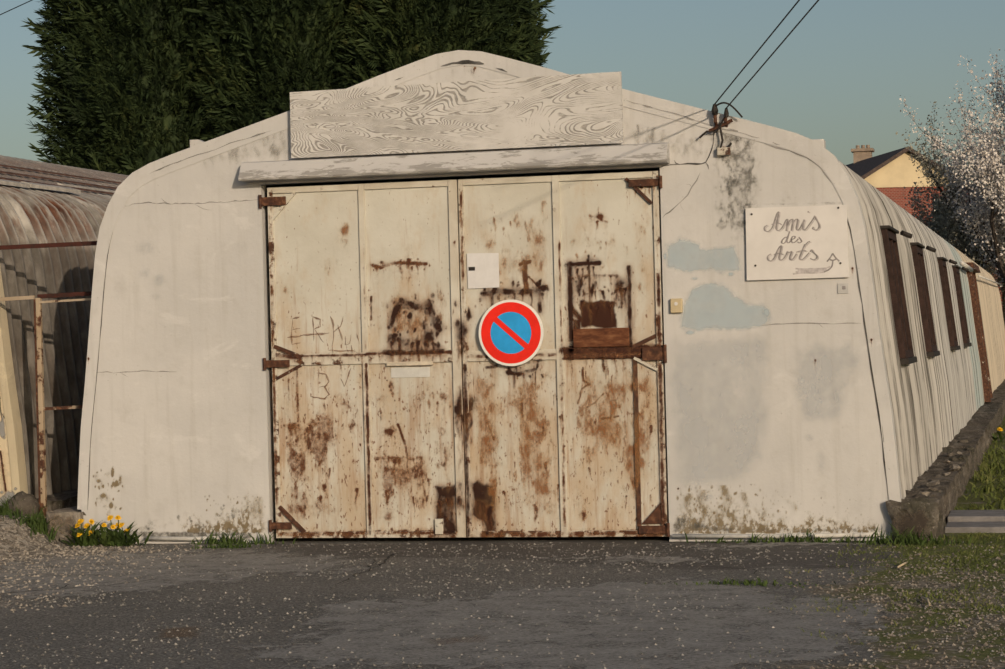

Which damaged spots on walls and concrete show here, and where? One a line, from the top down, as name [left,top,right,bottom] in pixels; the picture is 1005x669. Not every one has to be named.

damp [721,137,755,226]
peeling [664,241,737,275]
peeling [683,285,768,334]
rust [271,242,665,537]
damp [675,485,875,534]